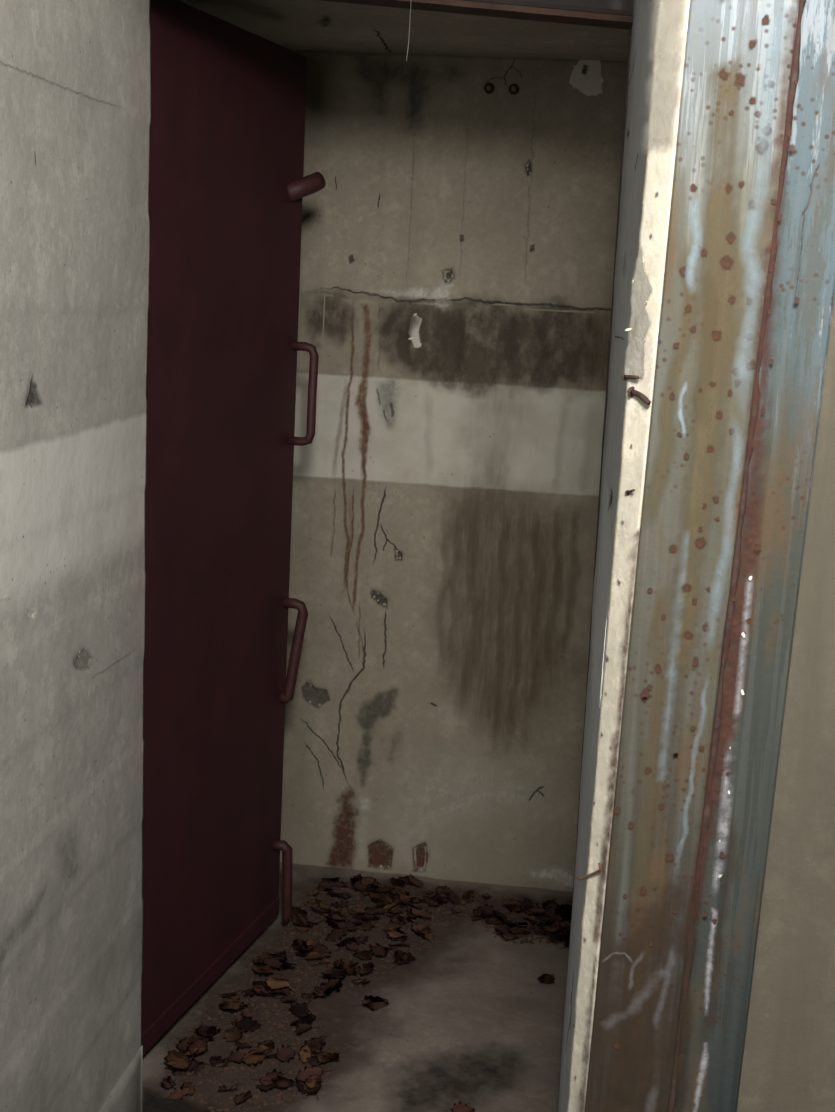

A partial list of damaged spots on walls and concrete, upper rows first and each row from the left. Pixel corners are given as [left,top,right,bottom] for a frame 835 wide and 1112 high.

peeling [569,60,604,96]
rust [713,68,798,156]
peeling [409,313,422,348]
crack [337,287,611,311]
leakage [382,301,589,389]
peeling [624,234,652,380]
rust [342,306,370,602]
crack [374,489,398,561]
rust [649,173,774,924]
leakage [452,499,562,728]
crack [305,613,387,786]
leakage [358,691,395,775]